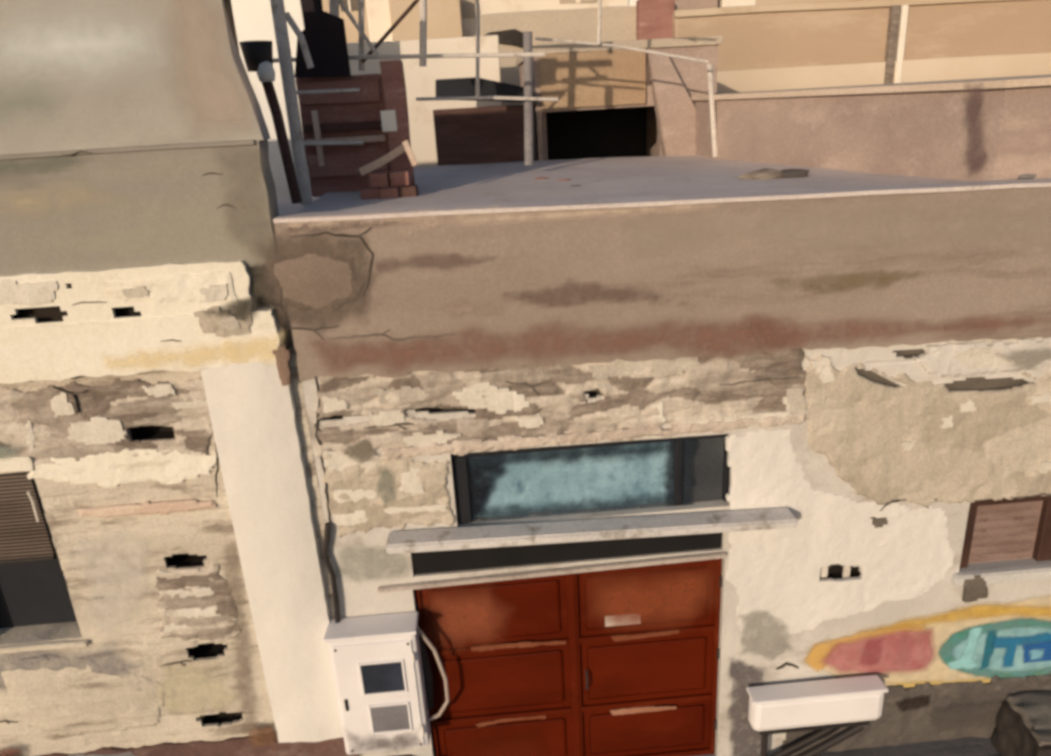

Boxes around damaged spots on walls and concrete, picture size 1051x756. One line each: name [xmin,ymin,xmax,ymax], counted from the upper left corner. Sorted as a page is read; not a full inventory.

water stain [967,87,987,170]
crack [257,227,454,342]
spalling [0,376,217,488]
peeling [313,337,1051,639]
spalling [155,553,242,659]
spalling [197,712,243,725]